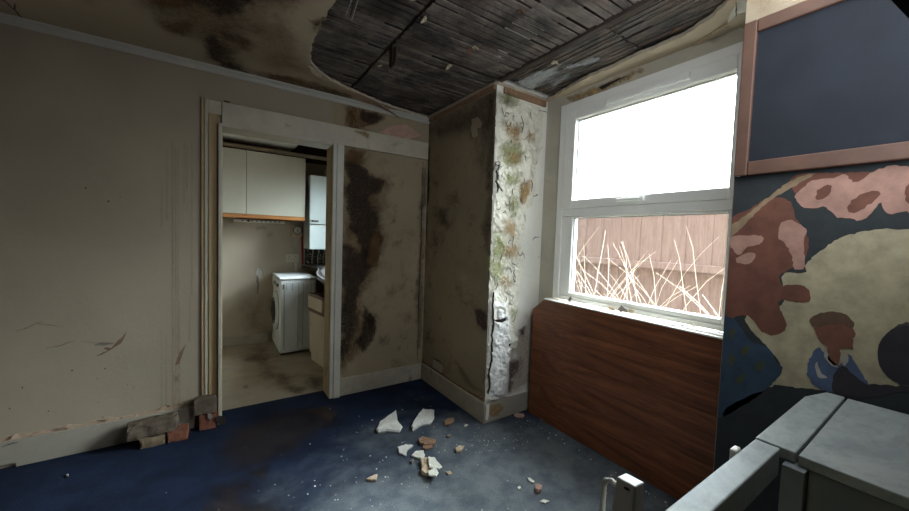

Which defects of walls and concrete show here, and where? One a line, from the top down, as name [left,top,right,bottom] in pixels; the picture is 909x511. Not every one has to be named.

leakage [258,31,351,98]
flaking render [690,0,747,47]
leakage [340,151,384,361]
peeling [485,93,546,420]